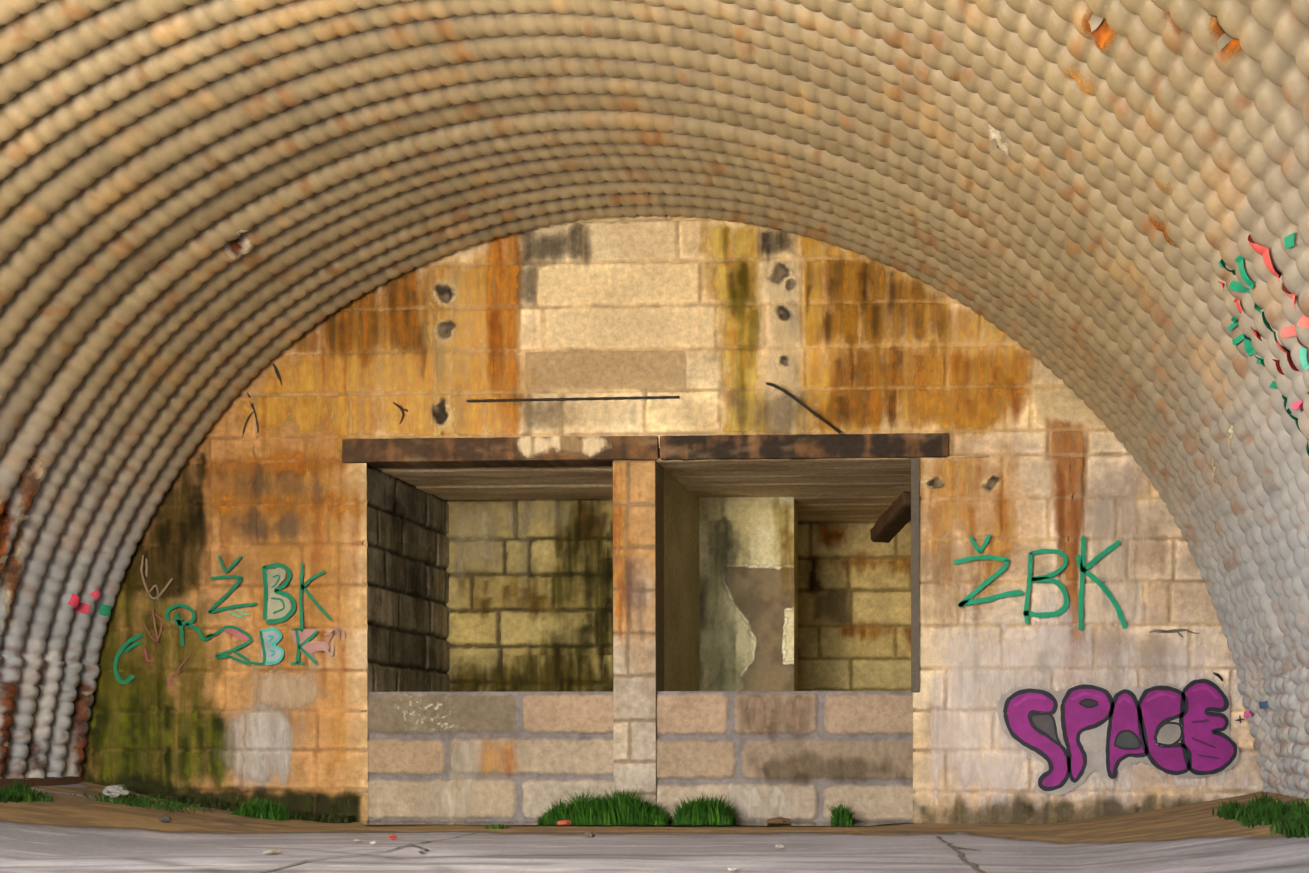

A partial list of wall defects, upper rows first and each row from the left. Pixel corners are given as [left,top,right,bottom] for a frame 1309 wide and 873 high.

corrosion [223,227,254,259]
corrosion [243,233,521,466]
corrosion [798,236,1028,434]
corrosion [0,456,43,629]
damp [373,493,531,731]
peeling [706,563,794,691]
corrosion [1048,421,1085,684]
corrosion [0,682,17,777]
corrosion [27,740,41,770]
crack [254,833,476,873]